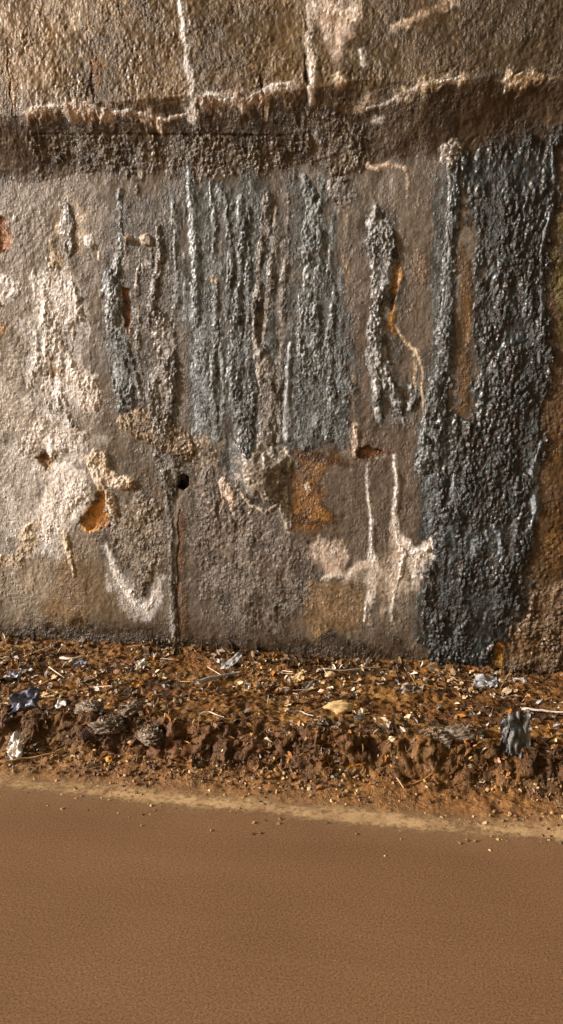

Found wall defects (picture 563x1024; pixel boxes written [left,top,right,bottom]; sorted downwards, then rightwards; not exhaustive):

leakage [0,0,563,674]
spalling [80,489,118,533]
corrosion [289,448,348,535]
spalling [356,448,390,459]
crack [163,498,187,641]